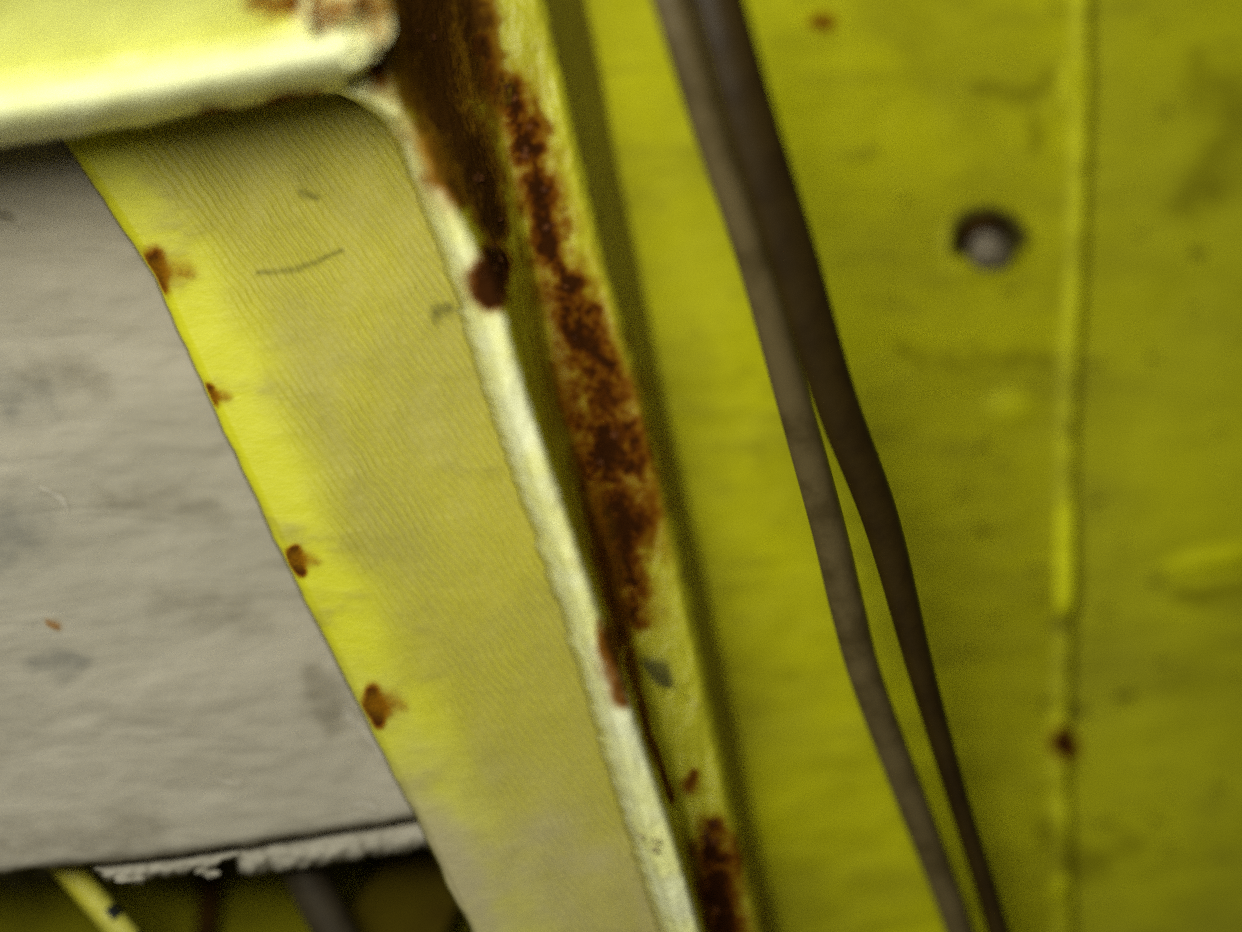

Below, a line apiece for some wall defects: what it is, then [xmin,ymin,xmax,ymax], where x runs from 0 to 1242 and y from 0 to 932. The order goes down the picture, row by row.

corrosion [144,247,189,294]
corrosion [246,0,699,804]
corrosion [1048,725,1079,761]
corrosion [690,817,746,932]